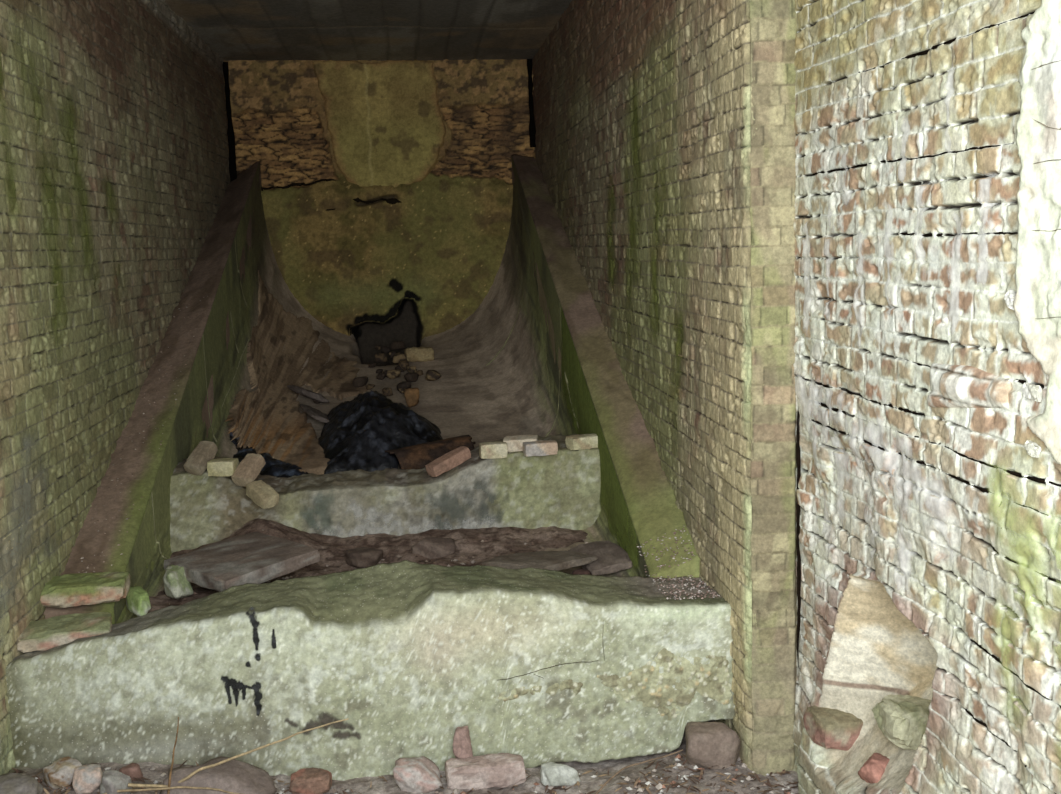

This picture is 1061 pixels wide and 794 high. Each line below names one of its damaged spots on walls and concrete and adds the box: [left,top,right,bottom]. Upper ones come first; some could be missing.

peeling [226,60,535,191]
peeling [1004,0,1061,464]
crack [795,375,1061,667]